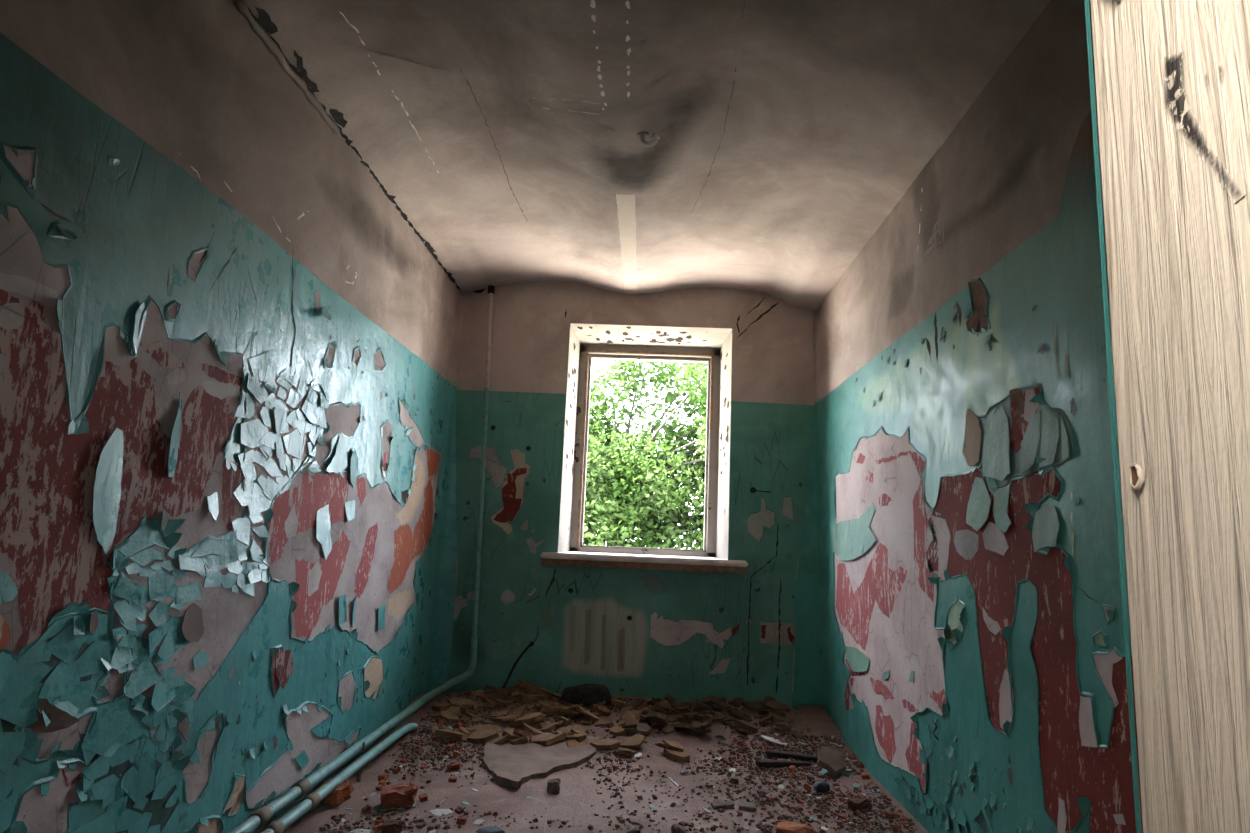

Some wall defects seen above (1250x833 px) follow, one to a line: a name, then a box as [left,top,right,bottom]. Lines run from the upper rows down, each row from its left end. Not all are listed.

peeling [233,0,353,146]
peeling [0,141,38,195]
peeling [940,277,992,351]
peeling [0,199,442,833]
peeling [468,444,531,535]
peeling [746,497,776,542]
peeling [649,611,740,650]
peeling [831,383,1145,833]